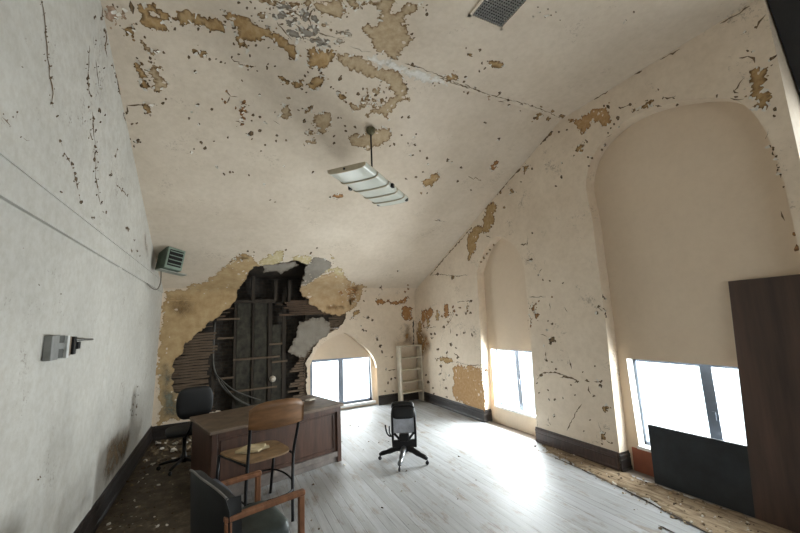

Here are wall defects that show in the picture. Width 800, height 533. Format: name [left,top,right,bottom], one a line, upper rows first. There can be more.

crack [40,1,59,118]
peeling [94,0,459,194]
crack [407,64,560,142]
peeling [532,89,679,167]
peeling [731,50,777,117]
peeling [467,202,505,263]
peeling [156,247,374,426]
peeling [401,300,487,412]